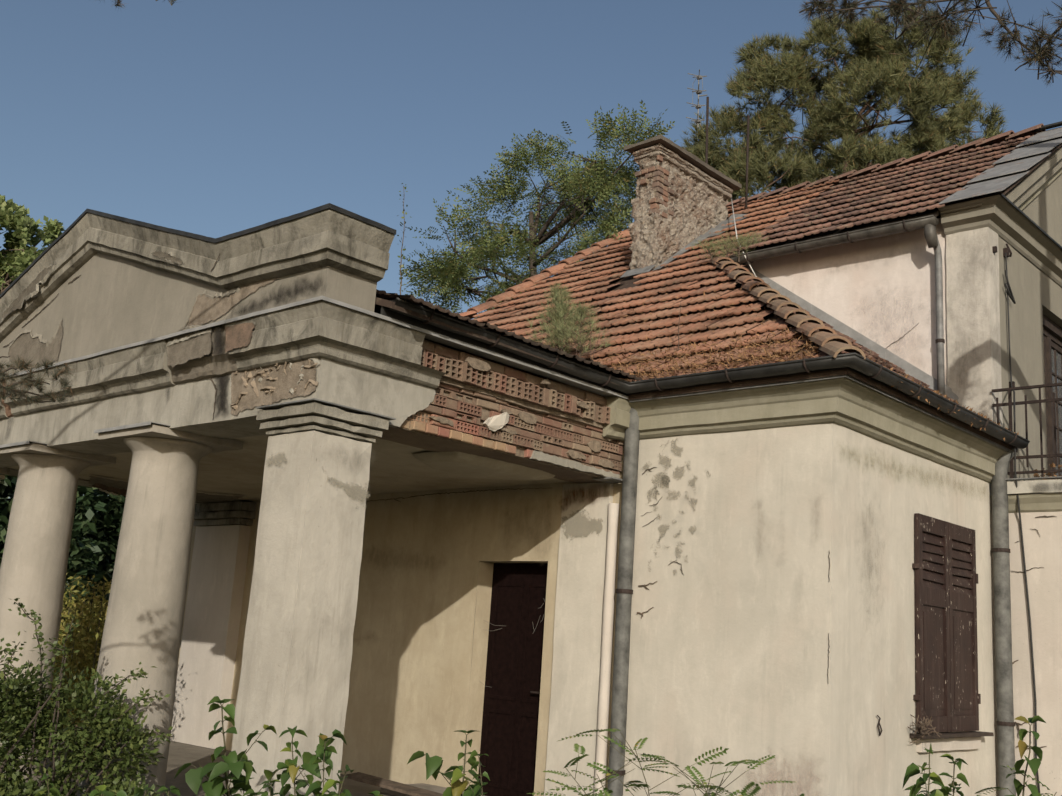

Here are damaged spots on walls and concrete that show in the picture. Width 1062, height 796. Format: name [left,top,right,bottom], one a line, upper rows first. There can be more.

flaking render [7,318,63,369]
flaking render [166,277,277,367]
flaking render [230,358,320,416]
spalling [395,339,624,478]
flaking render [562,510,602,538]
flaking render [643,440,709,557]